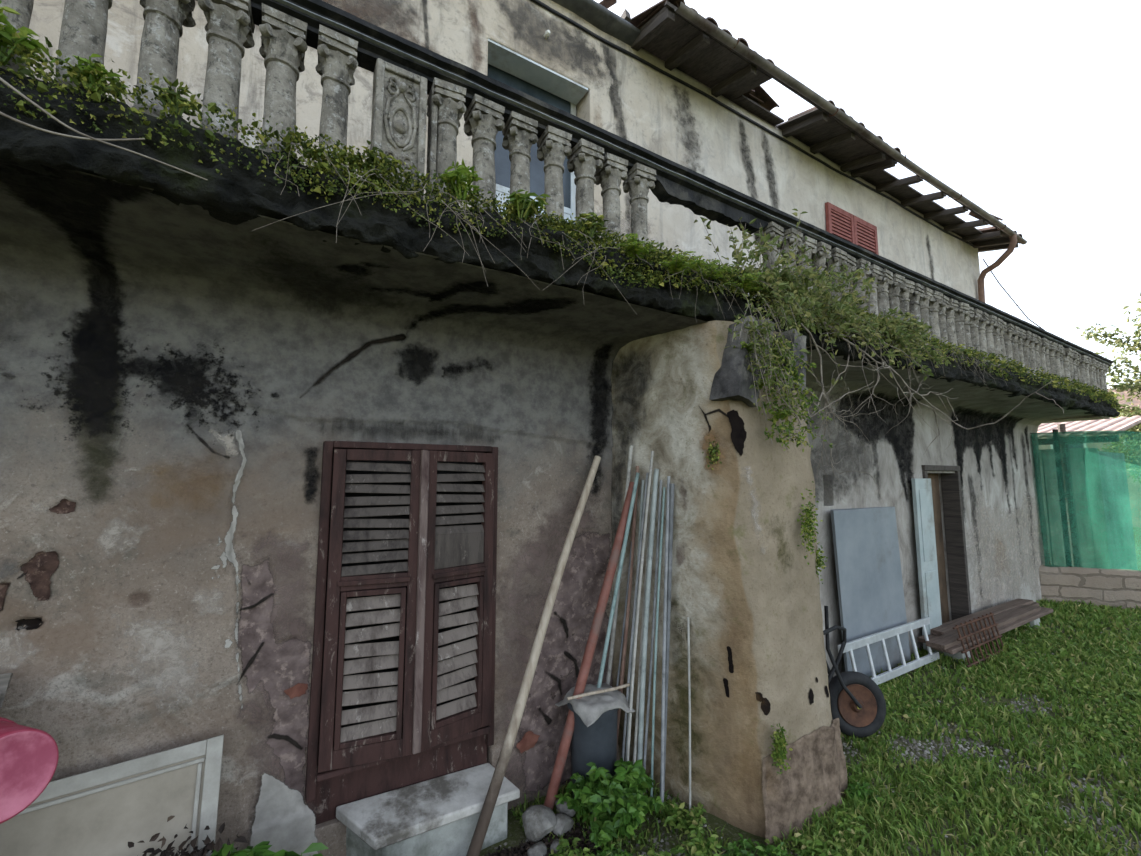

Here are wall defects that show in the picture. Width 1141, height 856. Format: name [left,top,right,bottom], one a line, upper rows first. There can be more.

water stain [322,0,416,42]
water stain [674,85,700,172]
water stain [739,120,778,209]
water stain [0,163,261,499]
water stain [806,390,920,500]
water stain [951,406,1035,576]
spalling [0,551,59,611]
crack [188,426,247,708]
peeling [124,621,197,710]
peeling [237,558,312,799]
peeling [495,495,613,799]